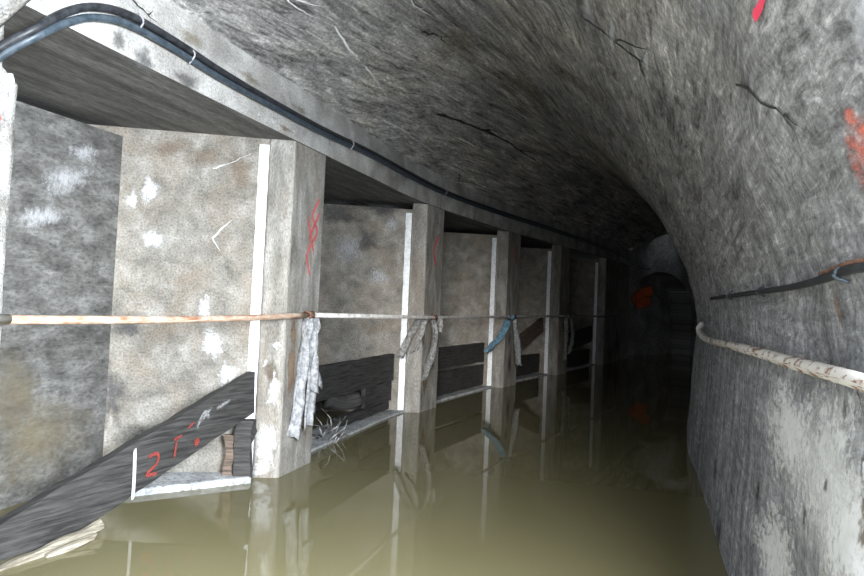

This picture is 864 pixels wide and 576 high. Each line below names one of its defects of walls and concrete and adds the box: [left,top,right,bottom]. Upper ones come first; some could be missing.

crack [580,15,664,90]
crack [735,83,802,151]